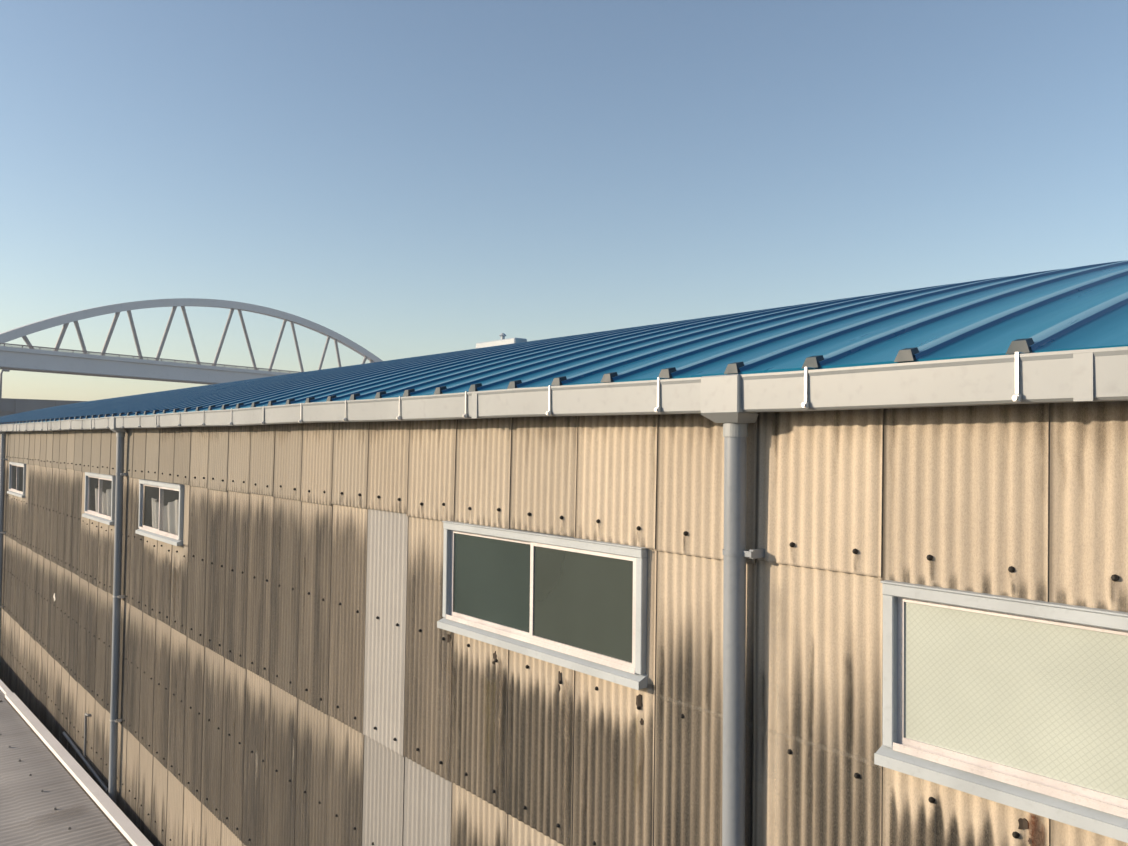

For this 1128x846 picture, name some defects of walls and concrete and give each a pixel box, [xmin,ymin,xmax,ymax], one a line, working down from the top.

water stain [0,469,366,846]
water stain [404,557,723,846]
water stain [745,680,753,846]
water stain [776,674,993,846]